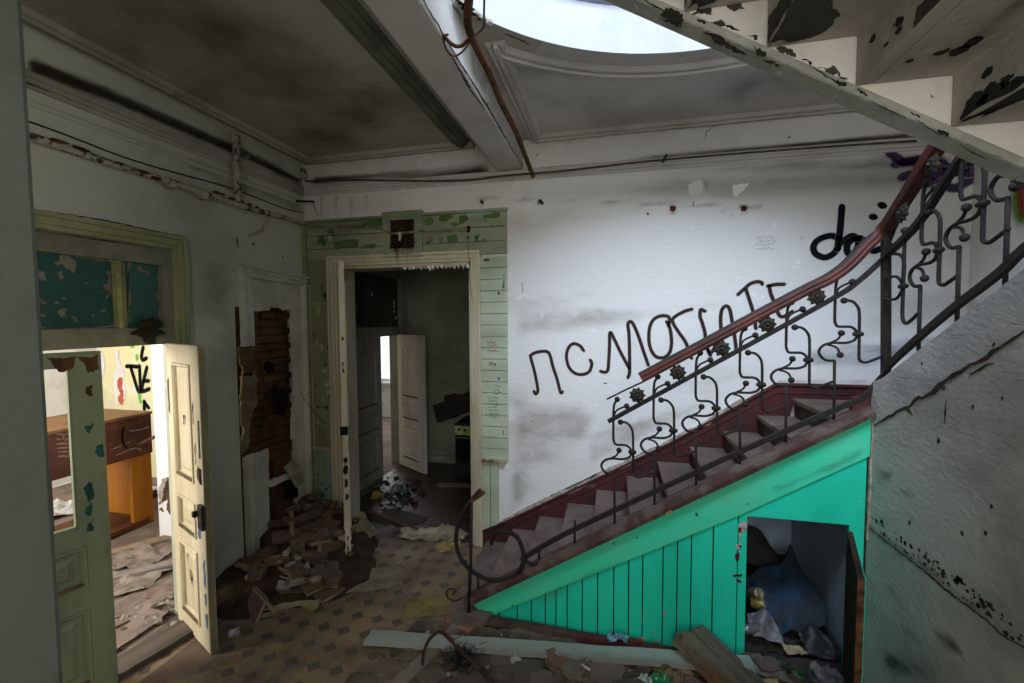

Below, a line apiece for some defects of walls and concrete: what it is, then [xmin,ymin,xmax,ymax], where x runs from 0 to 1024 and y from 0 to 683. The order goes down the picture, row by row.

peeling [660,0,868,96]
peeling [869,0,940,48]
peeling [932,36,985,57]
peeling [960,66,1024,122]
peeling [49,137,173,183]
peeling [317,219,382,252]
peeling [424,211,500,245]
peeling [38,254,115,329]
crack [874,330,1024,426]
flaking render [235,307,298,558]